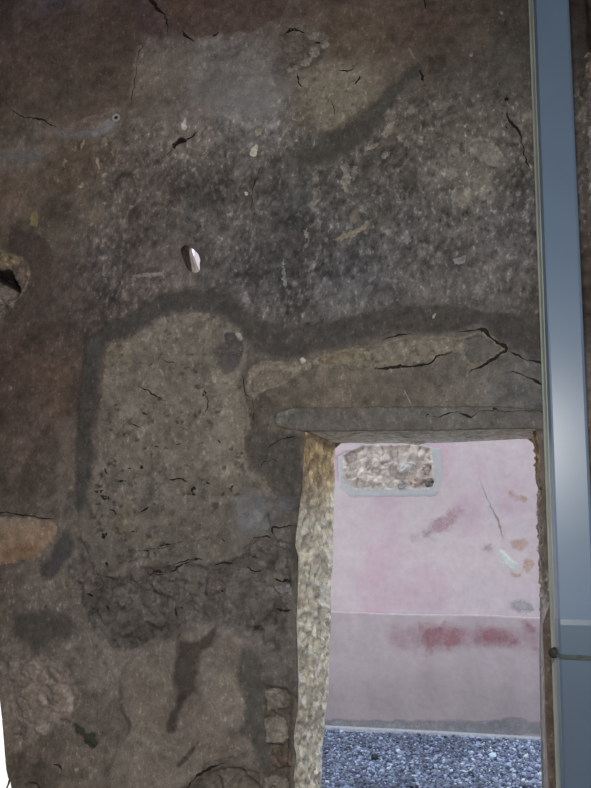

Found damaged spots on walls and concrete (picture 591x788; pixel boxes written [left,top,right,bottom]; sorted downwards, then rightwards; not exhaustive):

crack [147,0,220,43]
flaking render [159,0,372,137]
crack [0,93,65,133]
crack [161,131,199,159]
crack [504,96,535,188]
spalling [0,248,32,320]
crack [367,326,542,386]
crack [424,407,543,419]
crack [0,511,58,520]
crack [185,761,229,788]